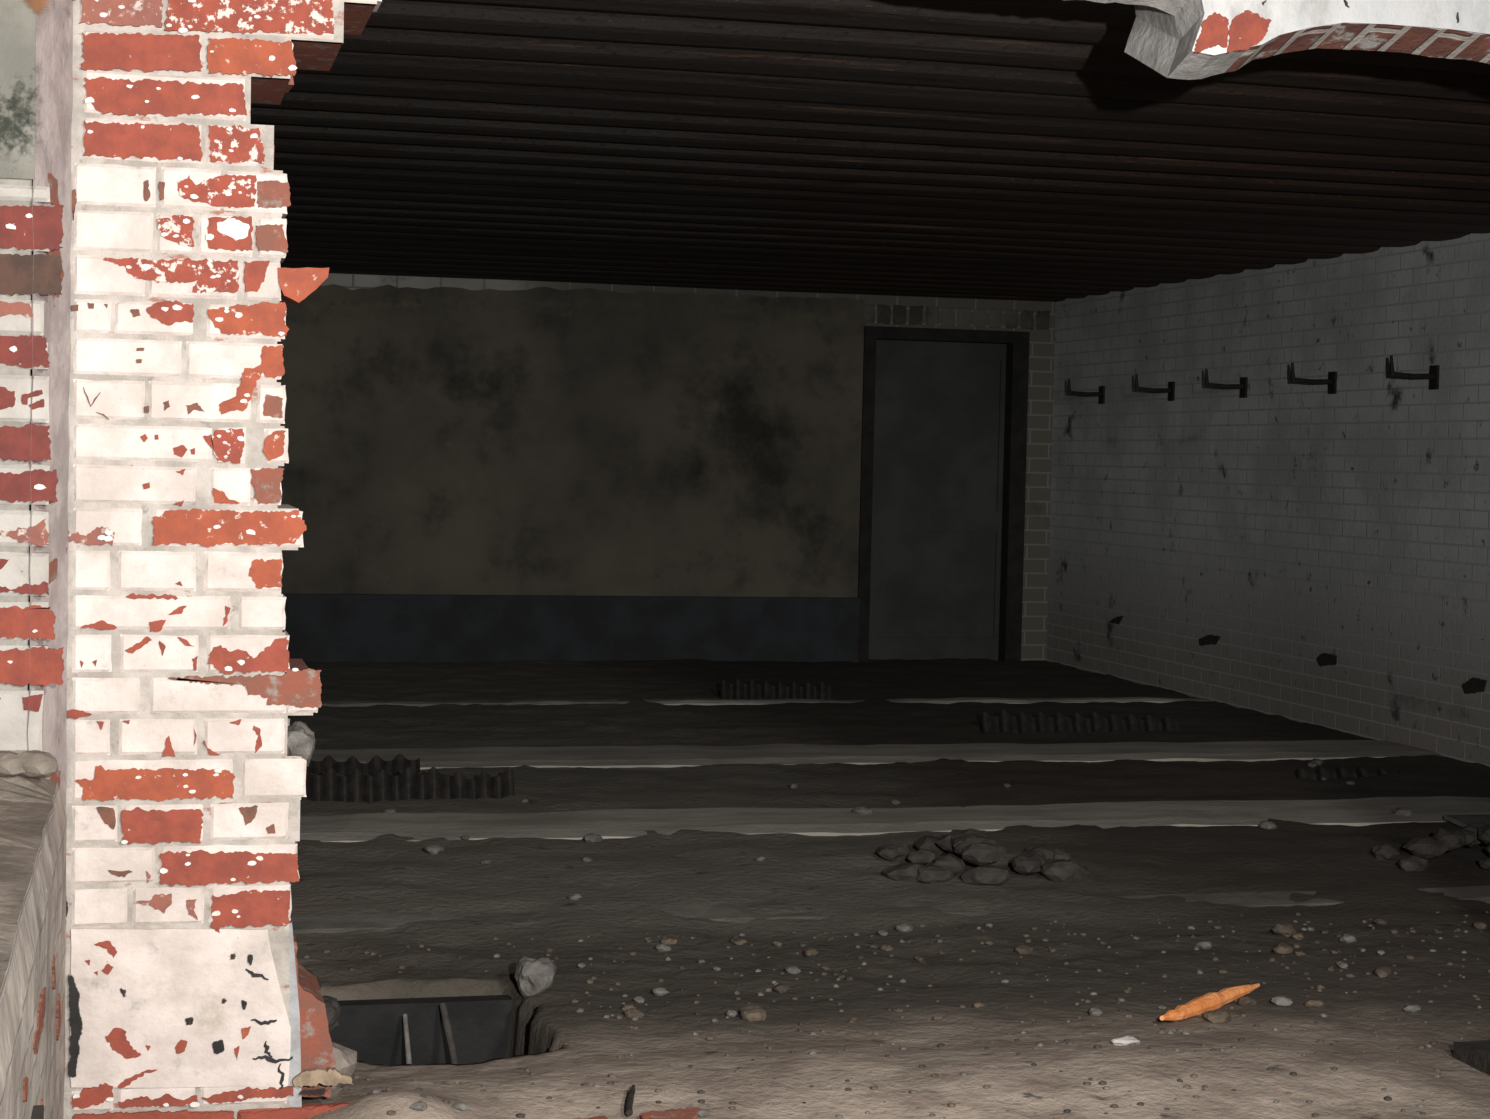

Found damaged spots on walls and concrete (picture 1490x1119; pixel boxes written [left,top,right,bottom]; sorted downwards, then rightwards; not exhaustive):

spalling [1193,10,1272,54]
leakage [0,91,36,152]
peeling [0,173,108,317]
peeling [80,0,335,589]
peeling [0,335,50,368]
peeling [0,387,97,712]
peeling [68,526,115,546]
peeling [81,620,117,630]
peeling [125,581,322,708]
peeling [49,732,299,933]
peeling [85,941,117,975]
peeling [71,1026,349,1119]